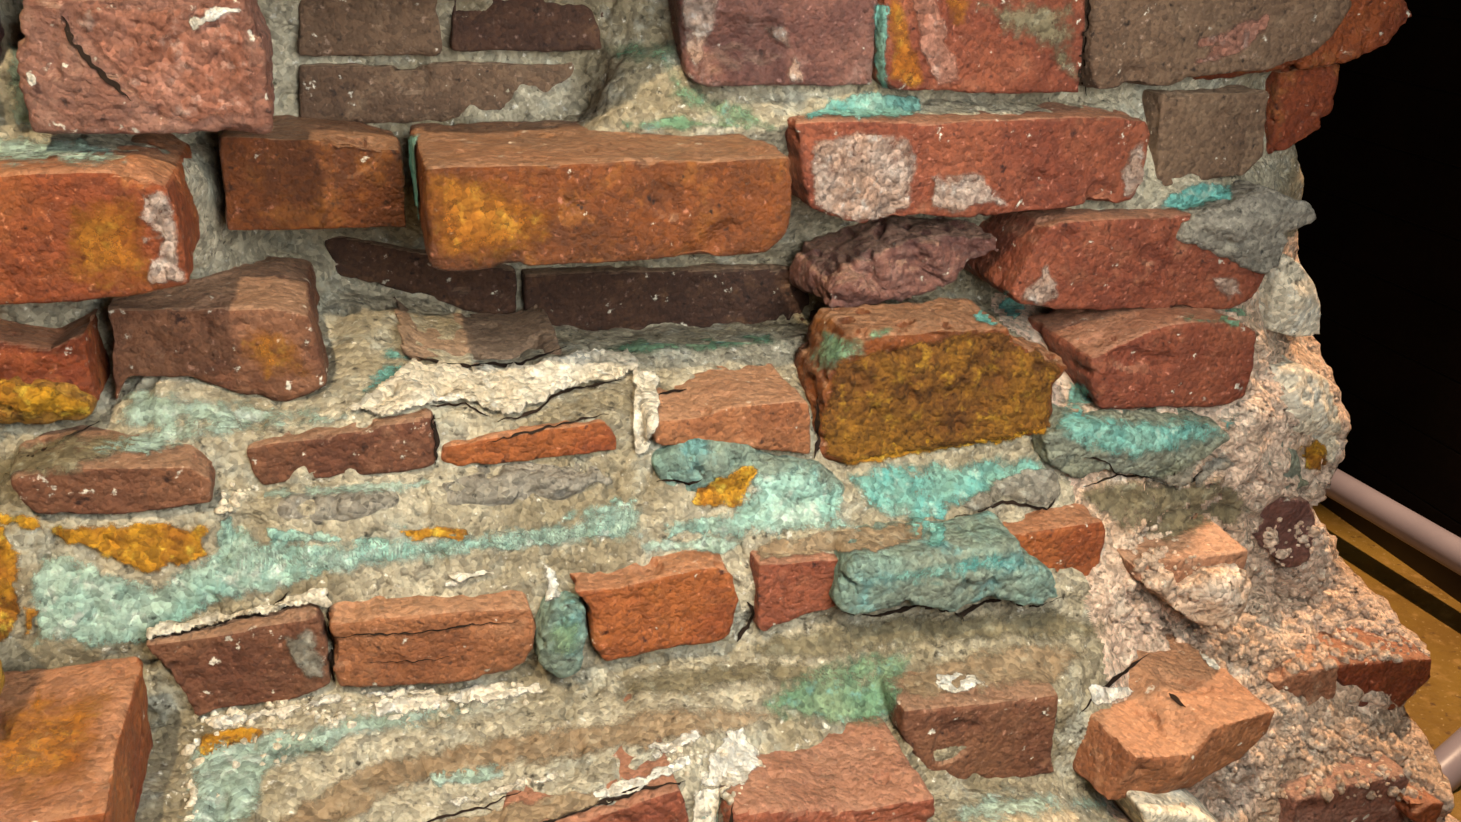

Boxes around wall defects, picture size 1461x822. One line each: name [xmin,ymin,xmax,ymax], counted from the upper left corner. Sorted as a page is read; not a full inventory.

crack [62,16,131,101]
peeling [346,348,660,455]
peeling [961,469,1060,511]
peeling [1147,455,1234,491]
crack [427,791,521,822]
crack [543,781,684,822]